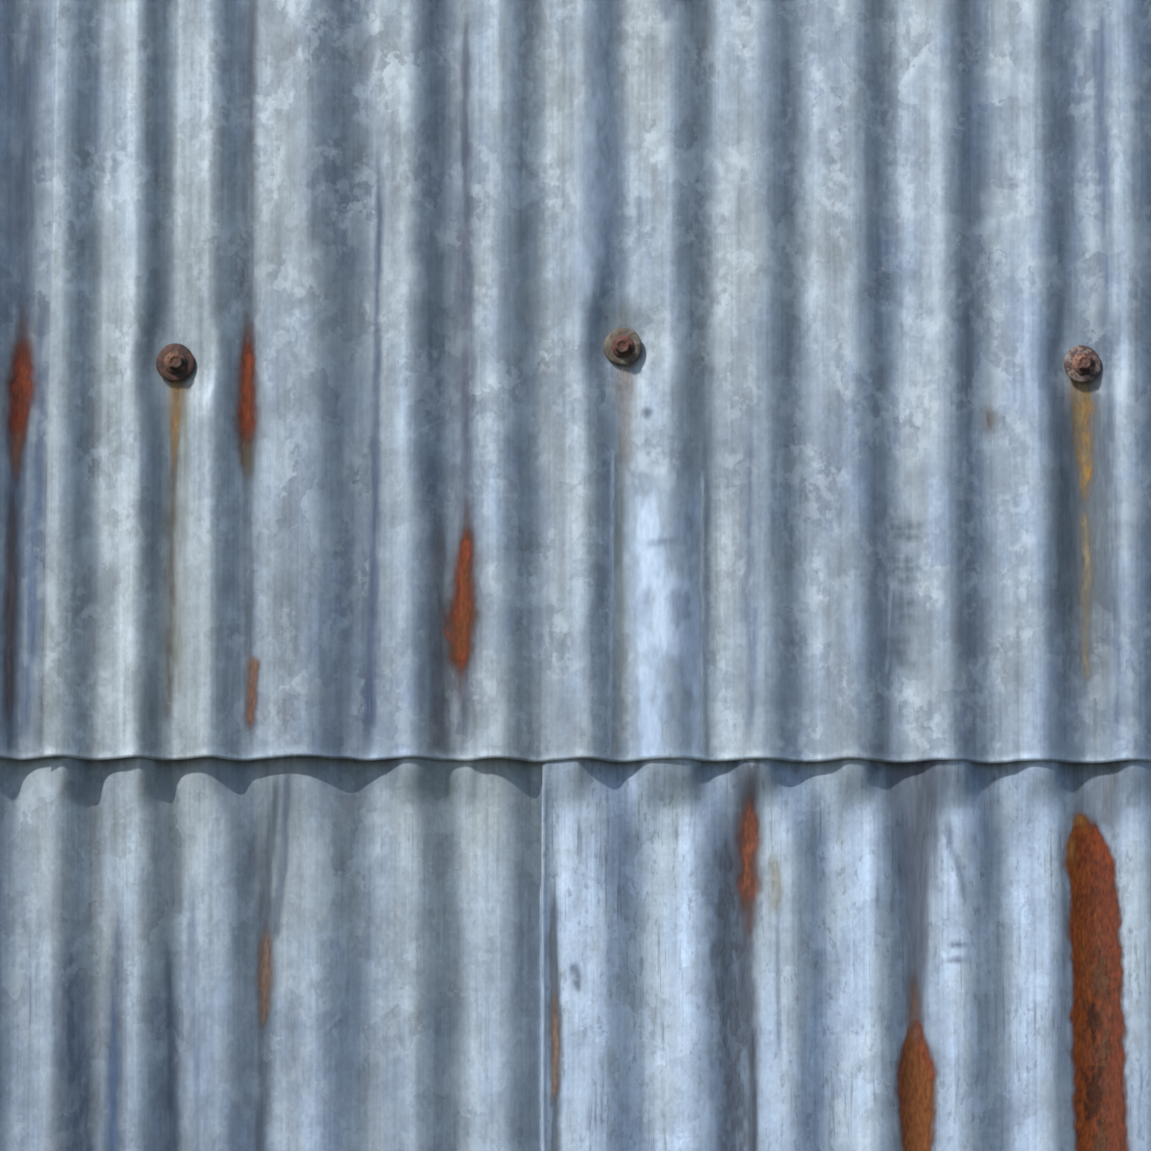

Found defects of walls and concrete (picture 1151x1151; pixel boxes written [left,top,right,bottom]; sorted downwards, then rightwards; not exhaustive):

rust [7,324,33,463]
rust [238,330,255,471]
rust [445,516,473,681]
rust [247,658,259,723]
rust [739,805,757,932]
rust [1066,816,1128,1151]
rust [897,988,935,1151]